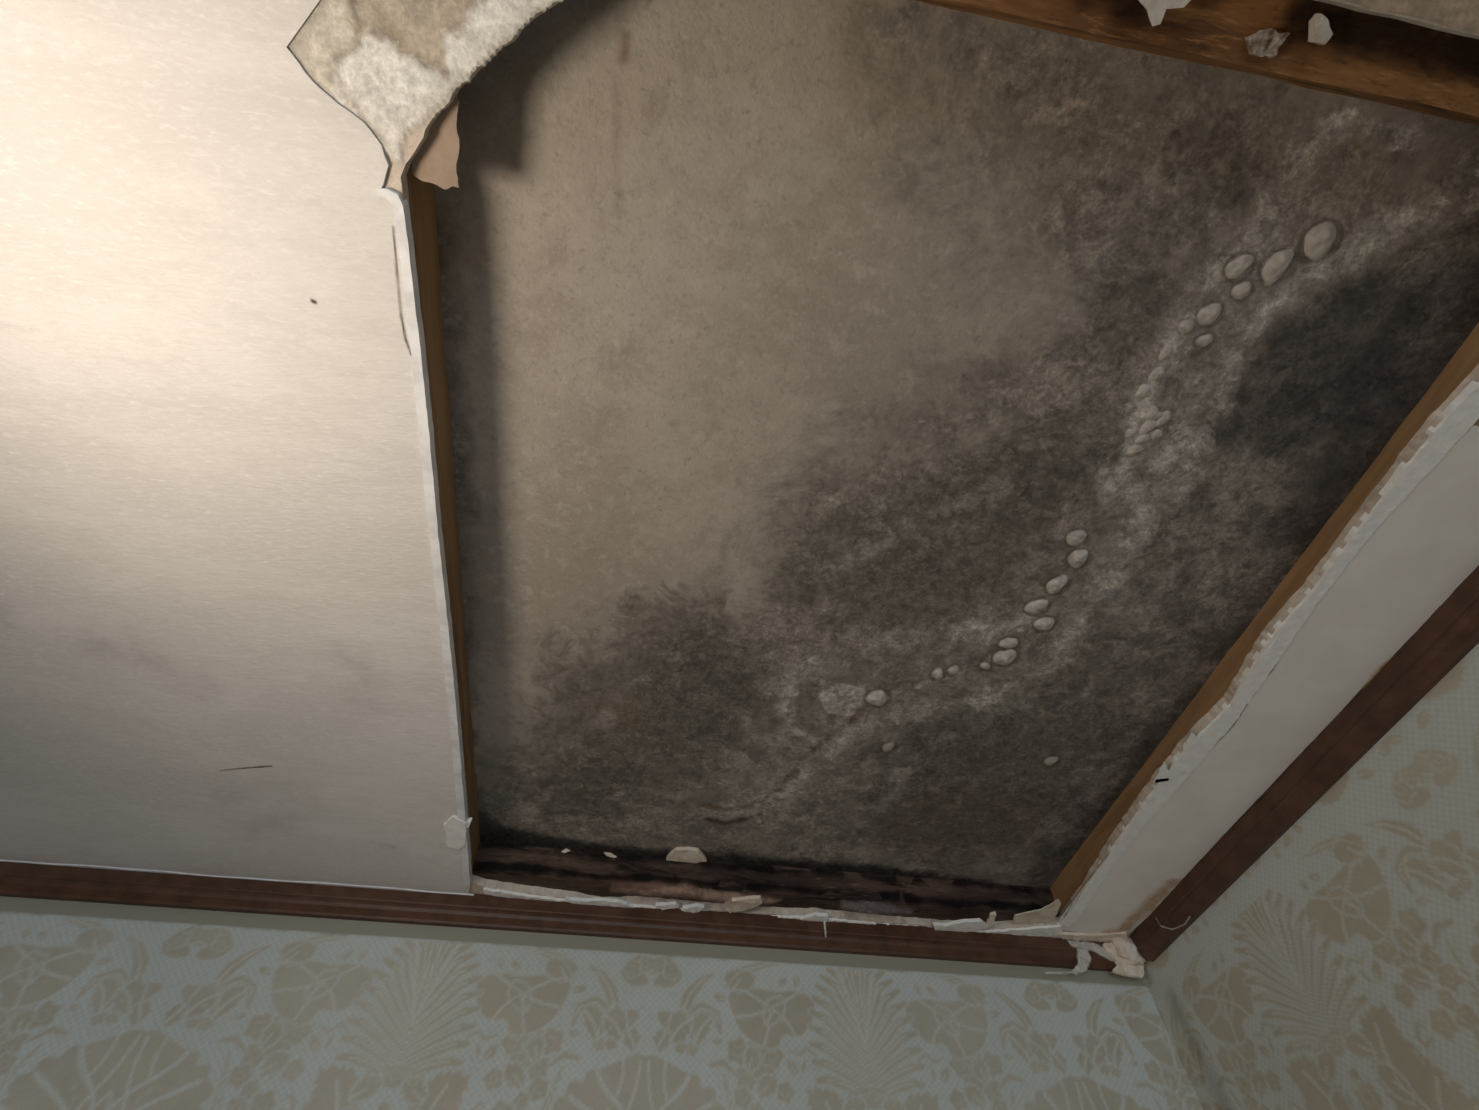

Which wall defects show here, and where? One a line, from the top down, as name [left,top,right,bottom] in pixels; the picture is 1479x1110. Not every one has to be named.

peeling [291,0,554,162]
peeling [1138,0,1191,26]
peeling [1244,28,1290,58]
peeling [1308,13,1333,45]
water stain [475,0,1479,913]
peeling [932,381,1479,938]